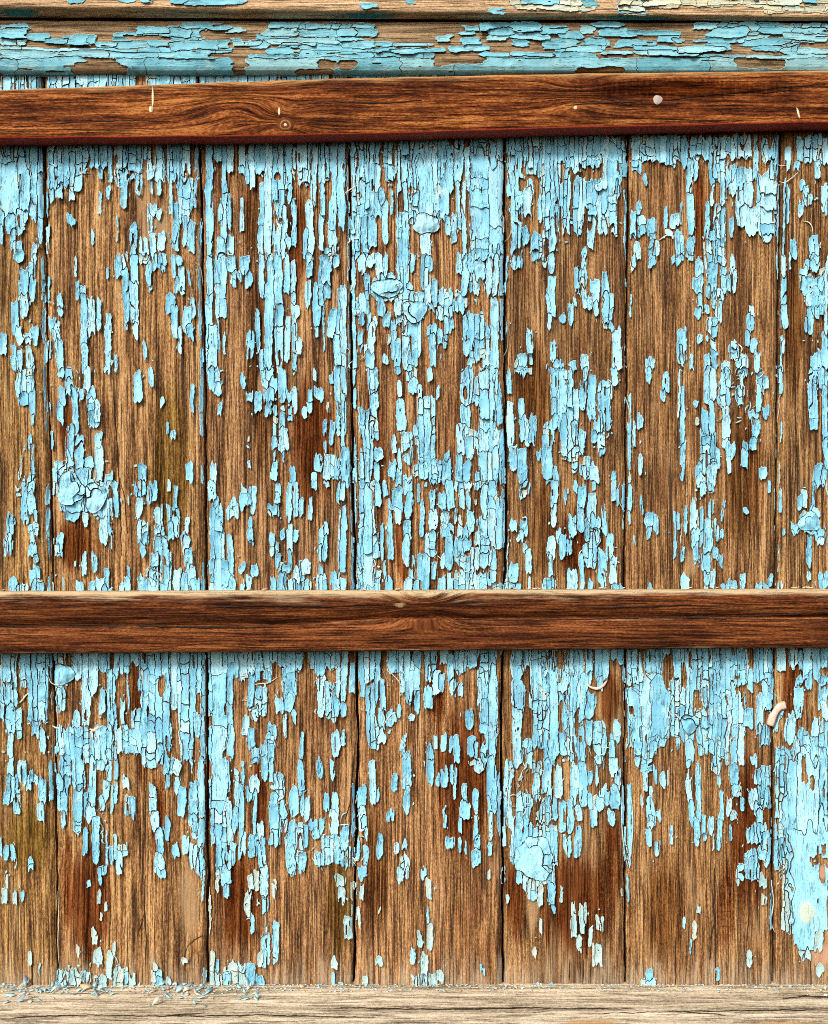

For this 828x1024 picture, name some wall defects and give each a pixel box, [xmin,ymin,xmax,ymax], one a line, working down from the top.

peeling [0,0,828,90]
peeling [0,132,828,591]
peeling [0,648,828,987]